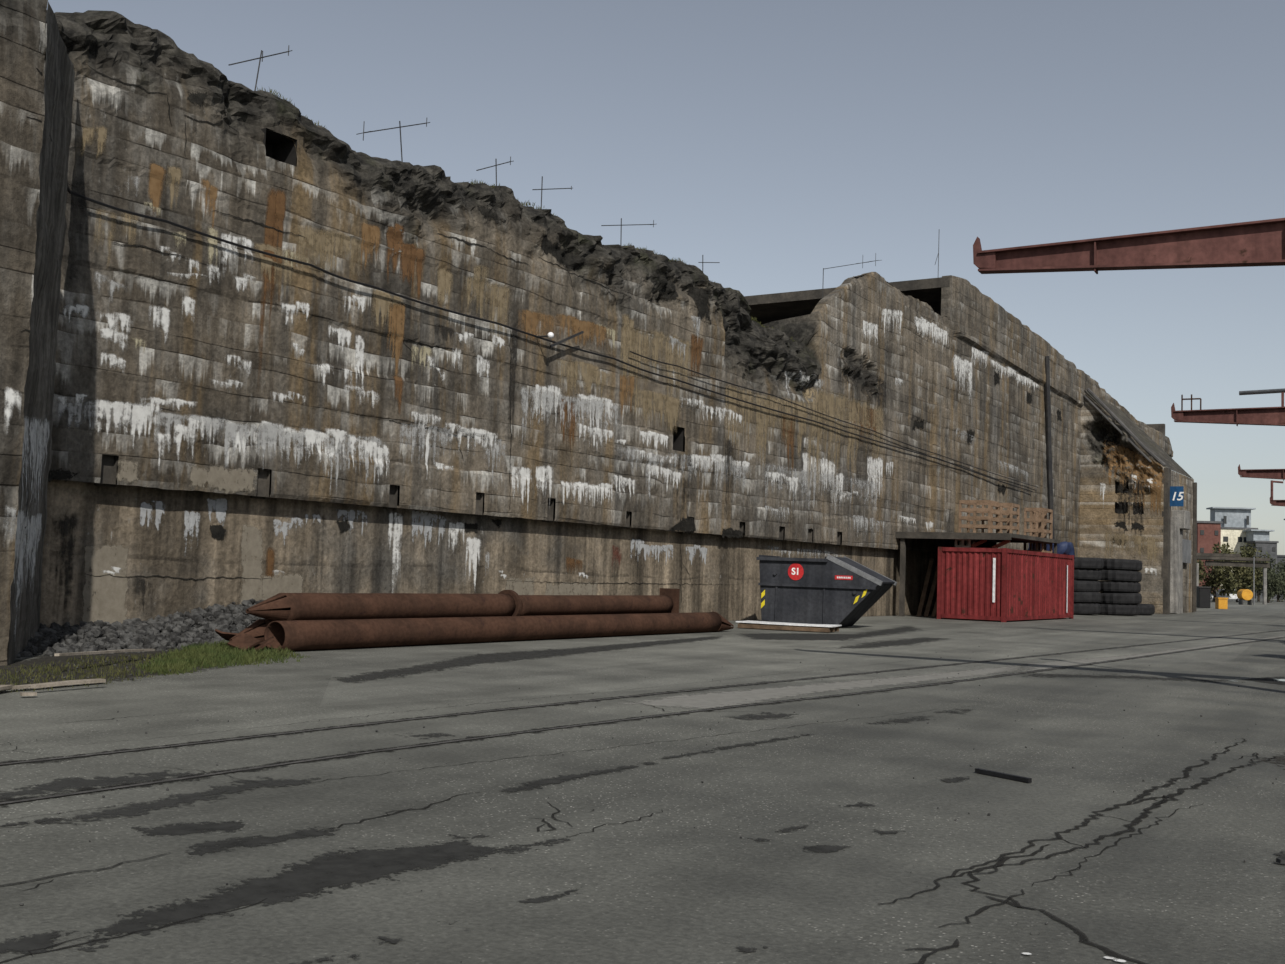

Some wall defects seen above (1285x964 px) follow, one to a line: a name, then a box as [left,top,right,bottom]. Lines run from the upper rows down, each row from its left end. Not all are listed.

damp [161,228,252,282]
damp [64,305,145,367]
damp [151,297,194,337]
damp [282,301,309,323]
damp [863,309,1039,397]
damp [5,325,749,635]
damp [765,438,893,532]
crack [1,647,1038,831]
crack [0,852,171,891]
damp [0,770,571,954]
crack [878,738,1285,964]
crack [0,898,267,963]